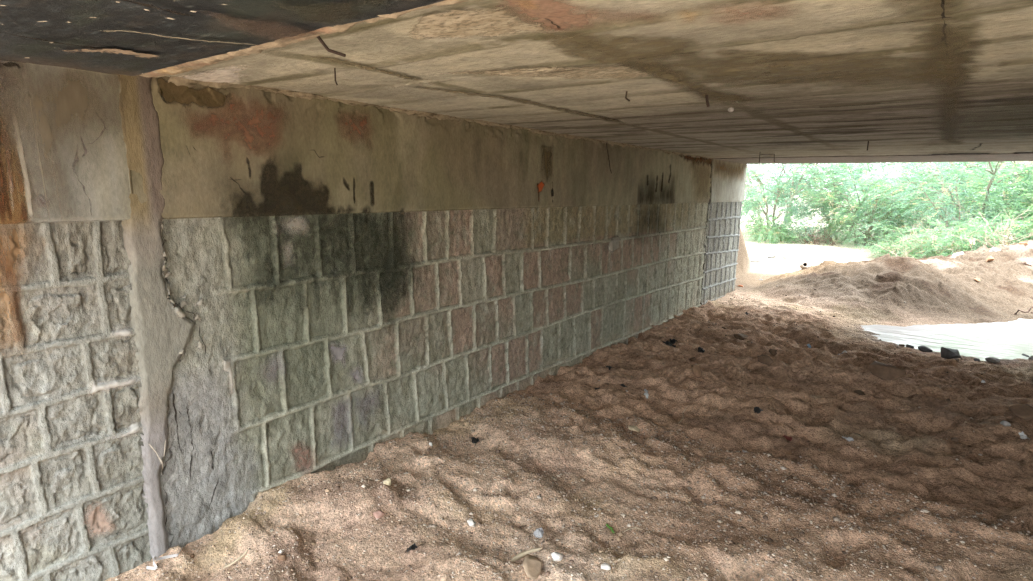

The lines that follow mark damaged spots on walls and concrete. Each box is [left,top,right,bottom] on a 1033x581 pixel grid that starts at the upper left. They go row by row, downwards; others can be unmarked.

damp [546,0,973,141]
crack [938,0,949,56]
corrosion [0,111,27,343]
damp [233,161,413,310]
damp [639,165,674,224]